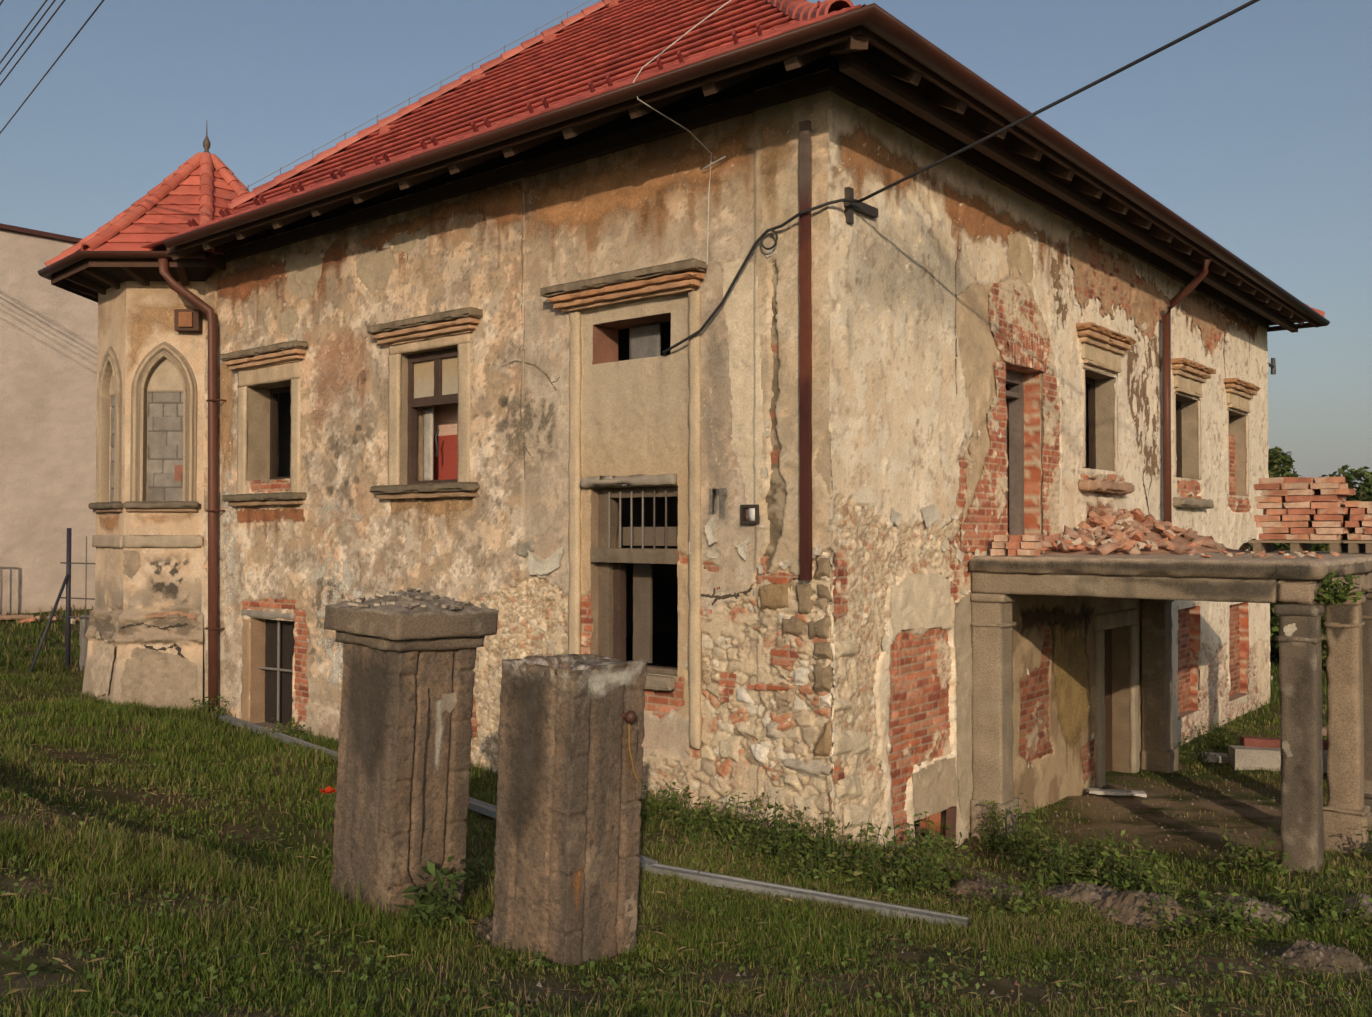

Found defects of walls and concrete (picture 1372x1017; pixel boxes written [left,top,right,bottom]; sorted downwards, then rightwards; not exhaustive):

spalling [123,550,141,579]
spalling [343,541,593,773]
flaking render [643,222,1230,851]
spalling [1227,496,1251,515]